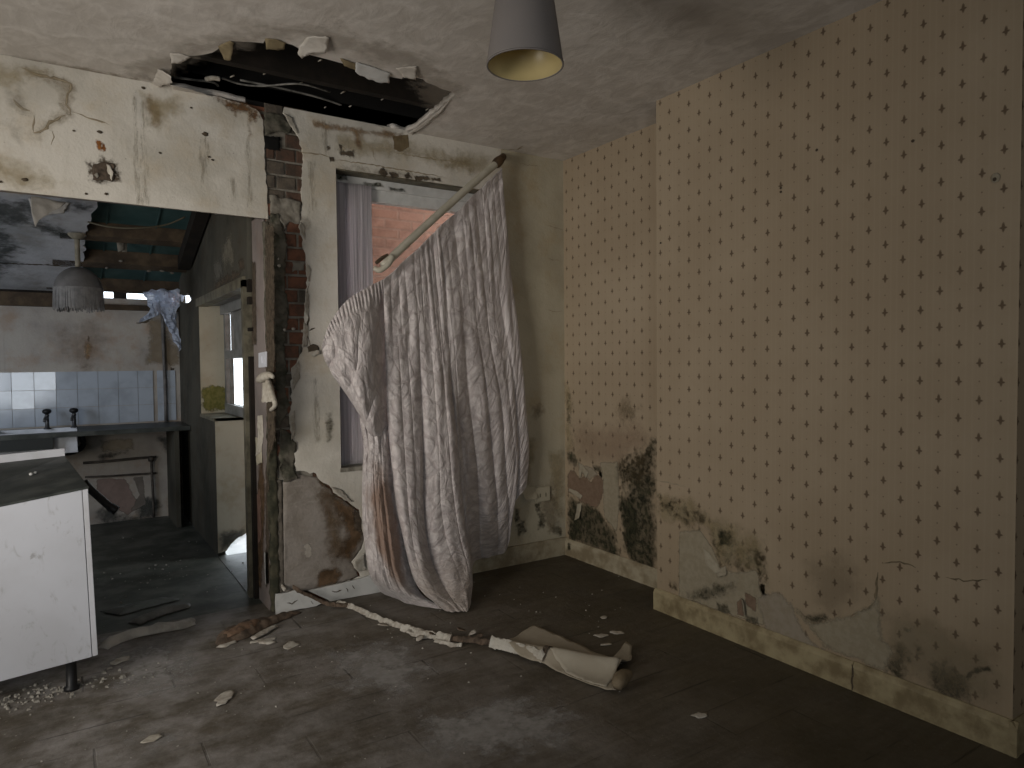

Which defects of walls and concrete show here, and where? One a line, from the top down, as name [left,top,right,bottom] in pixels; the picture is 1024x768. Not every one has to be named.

flaking render [88,158,120,183]
flaking render [255,103,366,612]
peeling [569,488,582,520]
damp [535,441,765,574]
peeling [679,530,764,624]